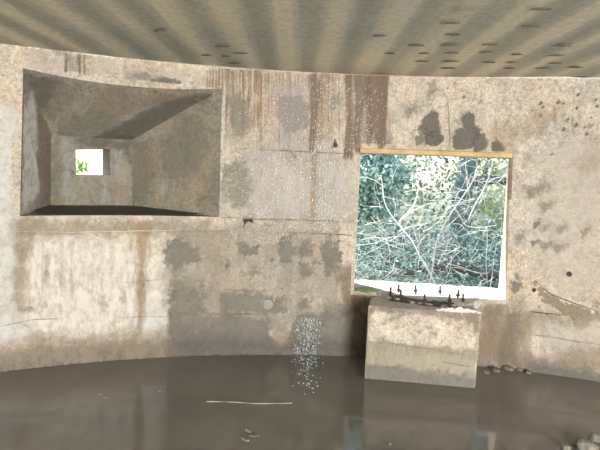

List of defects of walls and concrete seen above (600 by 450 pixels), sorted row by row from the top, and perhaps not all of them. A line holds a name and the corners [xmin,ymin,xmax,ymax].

corrosion [309,73,333,153]
corrosion [343,74,389,160]
water stain [415,110,444,146]
water stain [453,112,505,152]
water stain [221,76,377,281]
water stain [0,237,480,388]